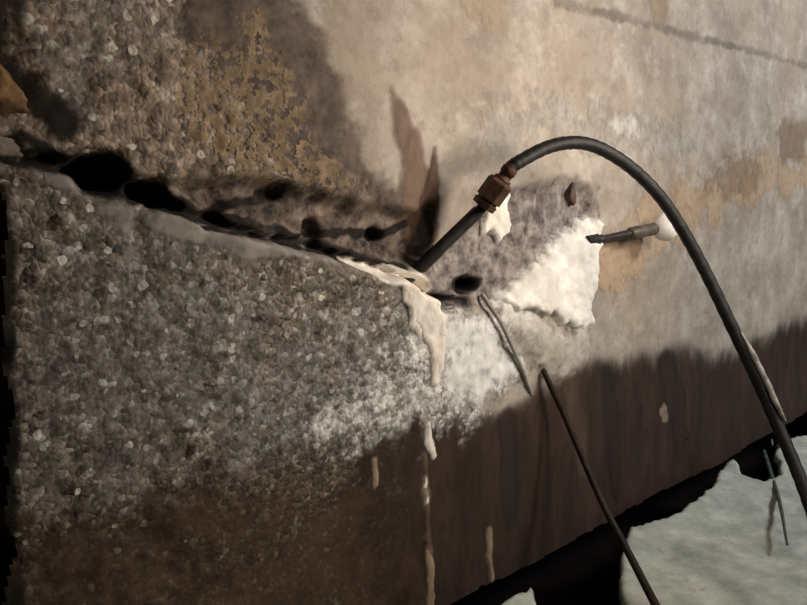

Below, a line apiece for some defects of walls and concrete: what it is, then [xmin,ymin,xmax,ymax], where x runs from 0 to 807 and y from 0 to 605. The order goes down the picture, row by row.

crack [0,130,71,175]
crack [104,180,408,271]
leakage [175,0,773,605]
leakage [751,320,807,425]